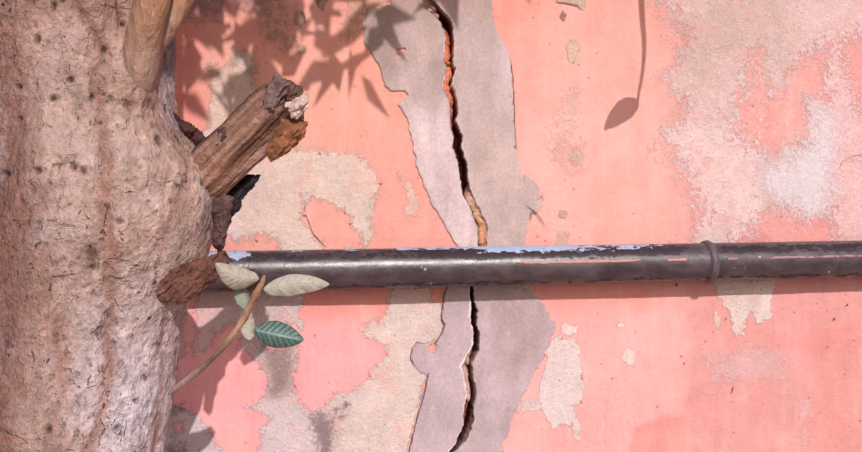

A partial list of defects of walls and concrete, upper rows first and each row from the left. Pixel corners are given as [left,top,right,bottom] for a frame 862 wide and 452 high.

peeling [556,0,585,21]
peeling [203,49,260,137]
peeling [208,146,383,261]
crack [417,0,489,247]
peeling [397,242,672,253]
water stain [759,108,840,220]
peeling [712,279,779,337]
peeling [165,403,224,452]
peeling [179,287,445,452]
crack [409,286,481,452]
peeling [519,323,584,441]